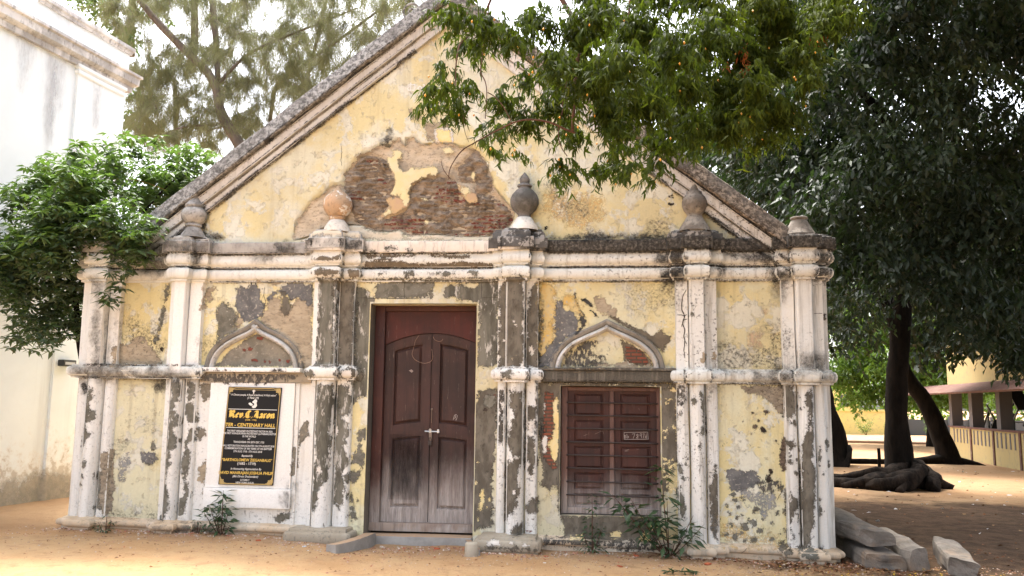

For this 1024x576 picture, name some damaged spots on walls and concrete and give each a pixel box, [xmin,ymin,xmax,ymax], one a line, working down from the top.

spalling [80,107,707,552]
crack [680,291,688,358]
peeling [707,384,830,561]